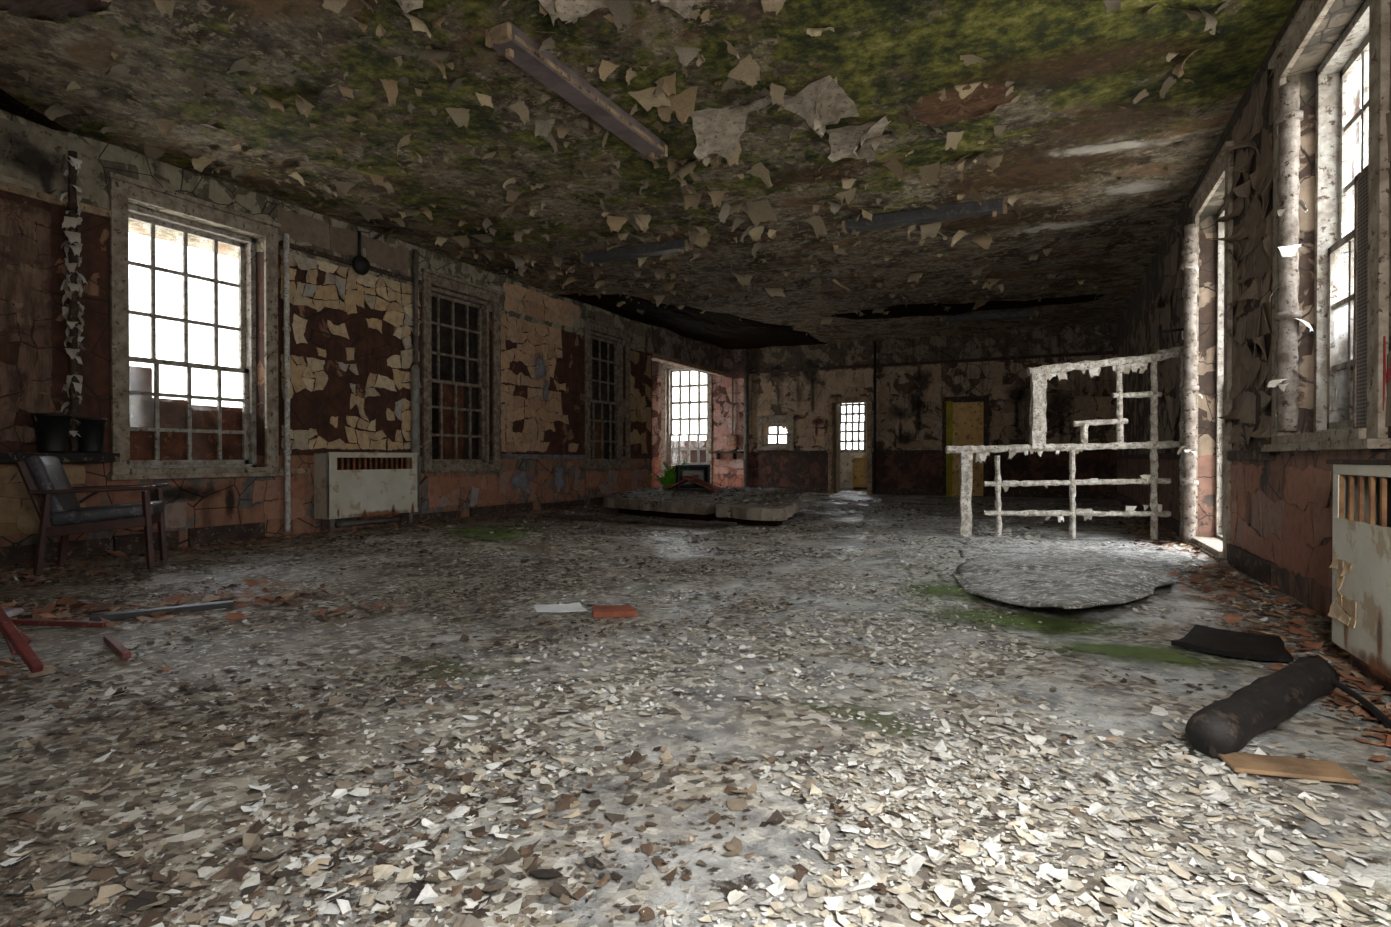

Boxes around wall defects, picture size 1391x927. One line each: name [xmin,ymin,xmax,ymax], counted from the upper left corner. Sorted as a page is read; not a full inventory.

peeling [1118,1,1229,109]
flaking render [102,0,1122,454]
peeling [713,366,941,475]
peeling [0,466,50,536]
peeling [62,465,86,485]
peeling [114,499,188,531]
peeling [252,480,305,520]
peeling [427,471,533,508]